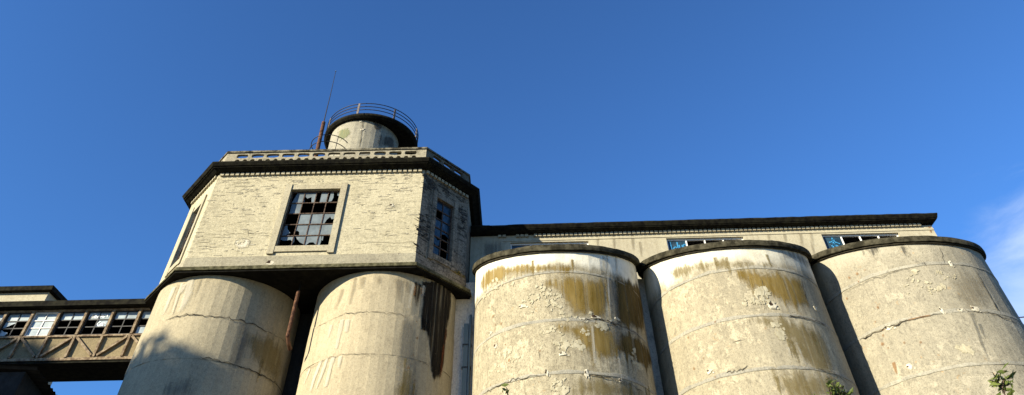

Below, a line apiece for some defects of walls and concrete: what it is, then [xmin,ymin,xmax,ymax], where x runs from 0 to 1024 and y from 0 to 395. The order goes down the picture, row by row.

water stain [399,281,451,395]
water stain [480,255,652,371]
peeling [519,283,620,356]
water stain [673,254,845,395]
peeling [742,286,786,341]
crack [863,313,938,339]
peeling [545,370,570,395]